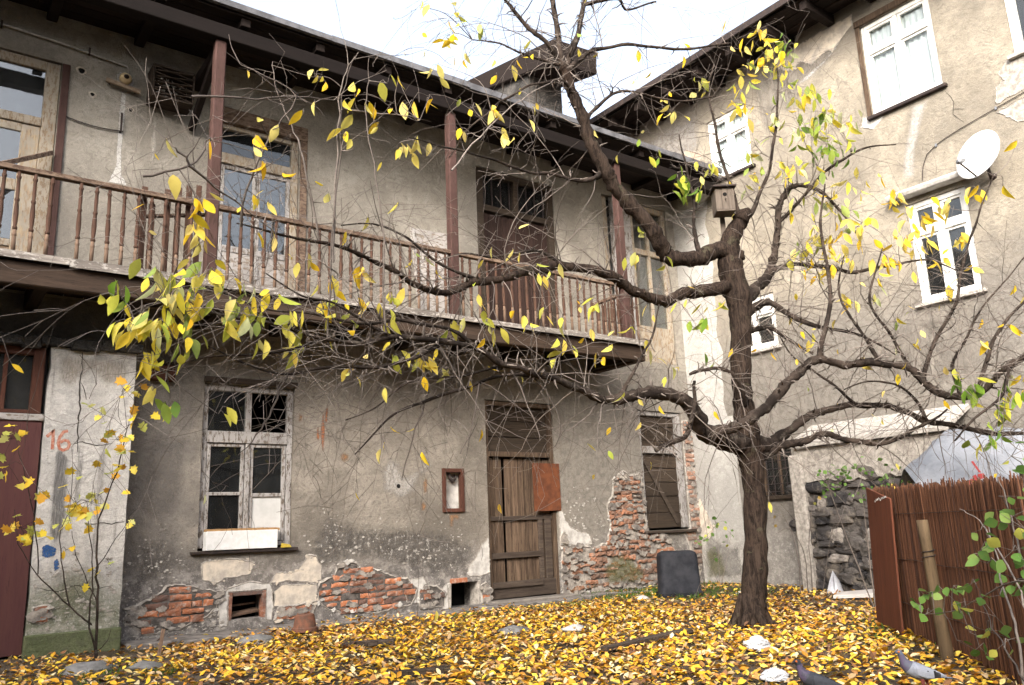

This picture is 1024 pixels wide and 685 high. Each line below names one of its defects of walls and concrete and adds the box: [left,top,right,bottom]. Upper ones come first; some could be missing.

spalling [25,508,494,640]
spalling [559,420,715,594]